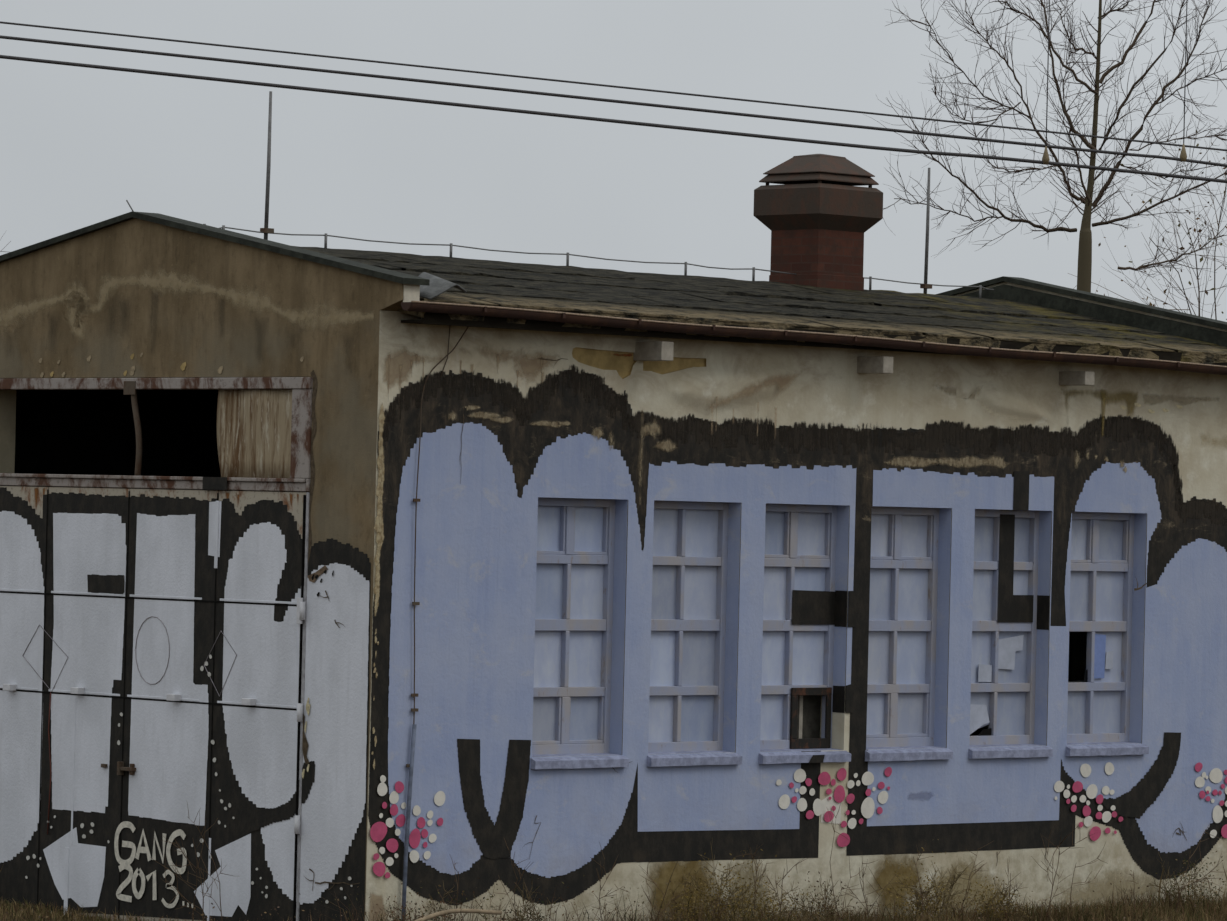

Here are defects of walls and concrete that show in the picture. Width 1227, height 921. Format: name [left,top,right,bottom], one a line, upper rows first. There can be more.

leakage [0,271,374,338]
leakage [385,350,424,392]
spalling [572,347,706,379]